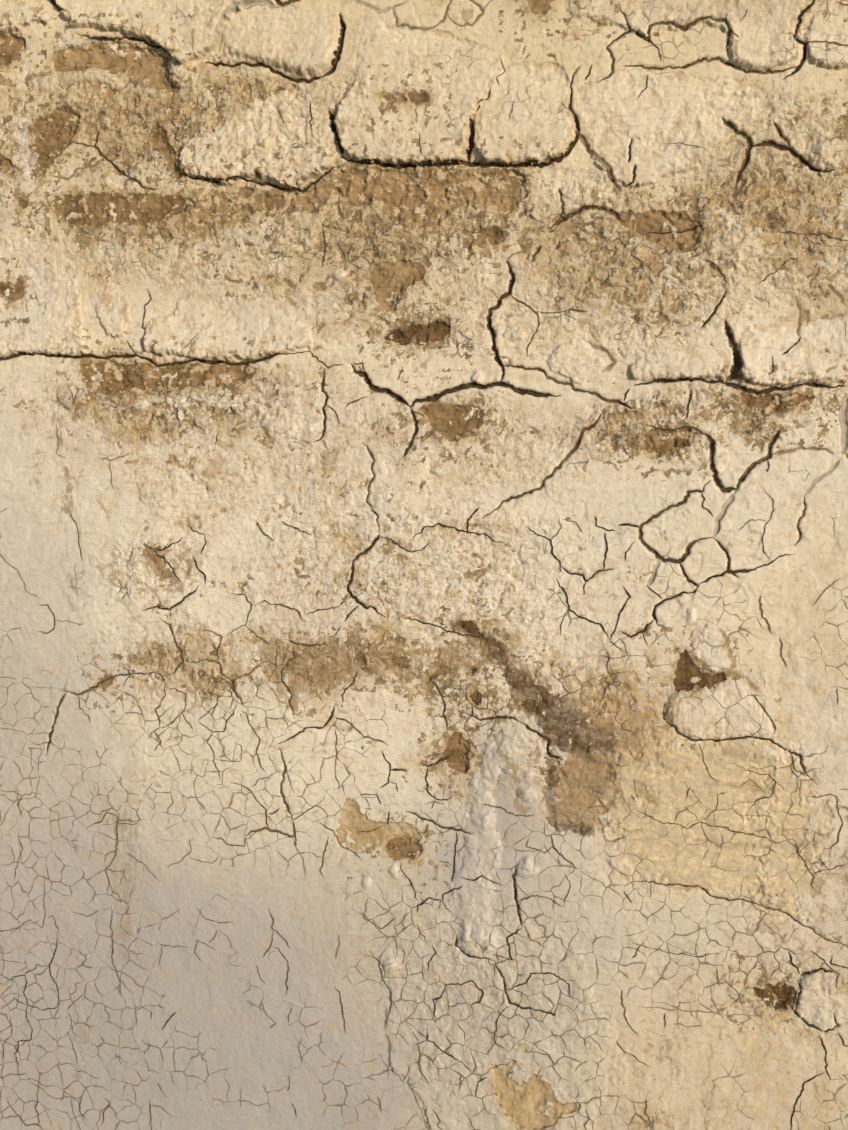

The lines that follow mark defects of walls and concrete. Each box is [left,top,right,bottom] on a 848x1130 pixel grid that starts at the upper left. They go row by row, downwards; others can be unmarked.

crack [51,0,171,57]
flaking render [0,0,848,234]
crack [183,0,848,193]
flaking render [44,236,313,395]
flaking render [629,317,848,418]
crack [0,188,848,1048]
peeling [595,622,848,934]
crack [0,876,111,1130]
crack [408,980,487,1130]
peeling [379,897,630,1130]
crack [616,881,848,1130]
flaking render [754,971,844,1029]